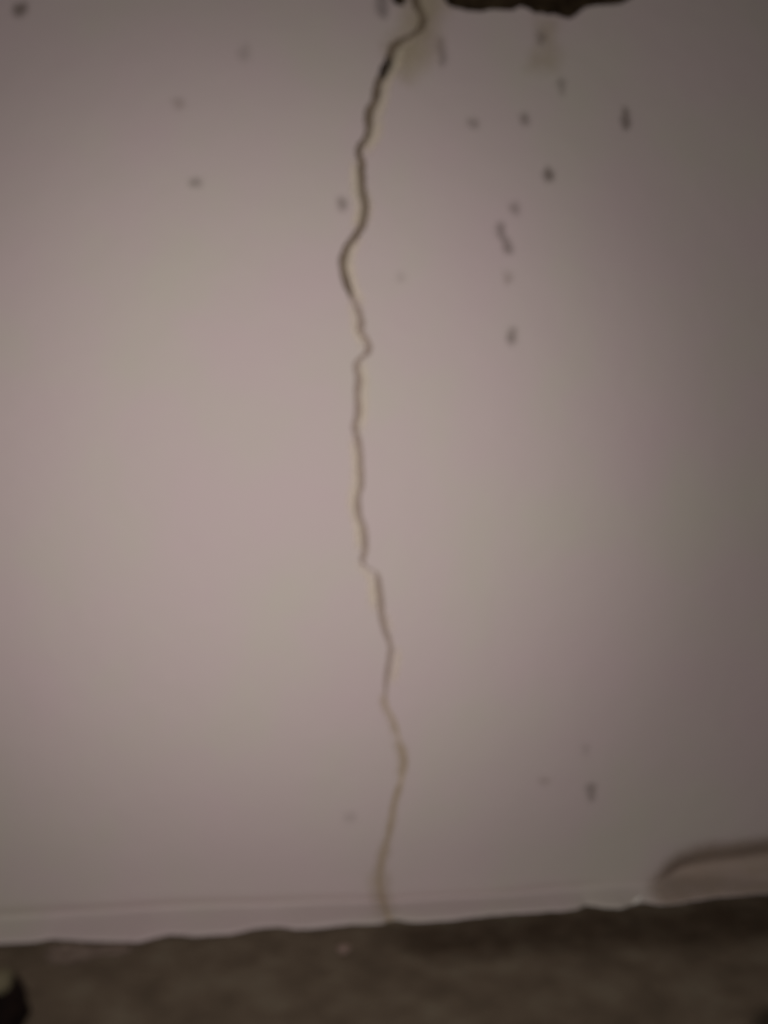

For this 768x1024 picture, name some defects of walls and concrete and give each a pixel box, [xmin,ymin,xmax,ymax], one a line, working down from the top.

crack [338,0,428,922]
spalling [445,0,627,19]